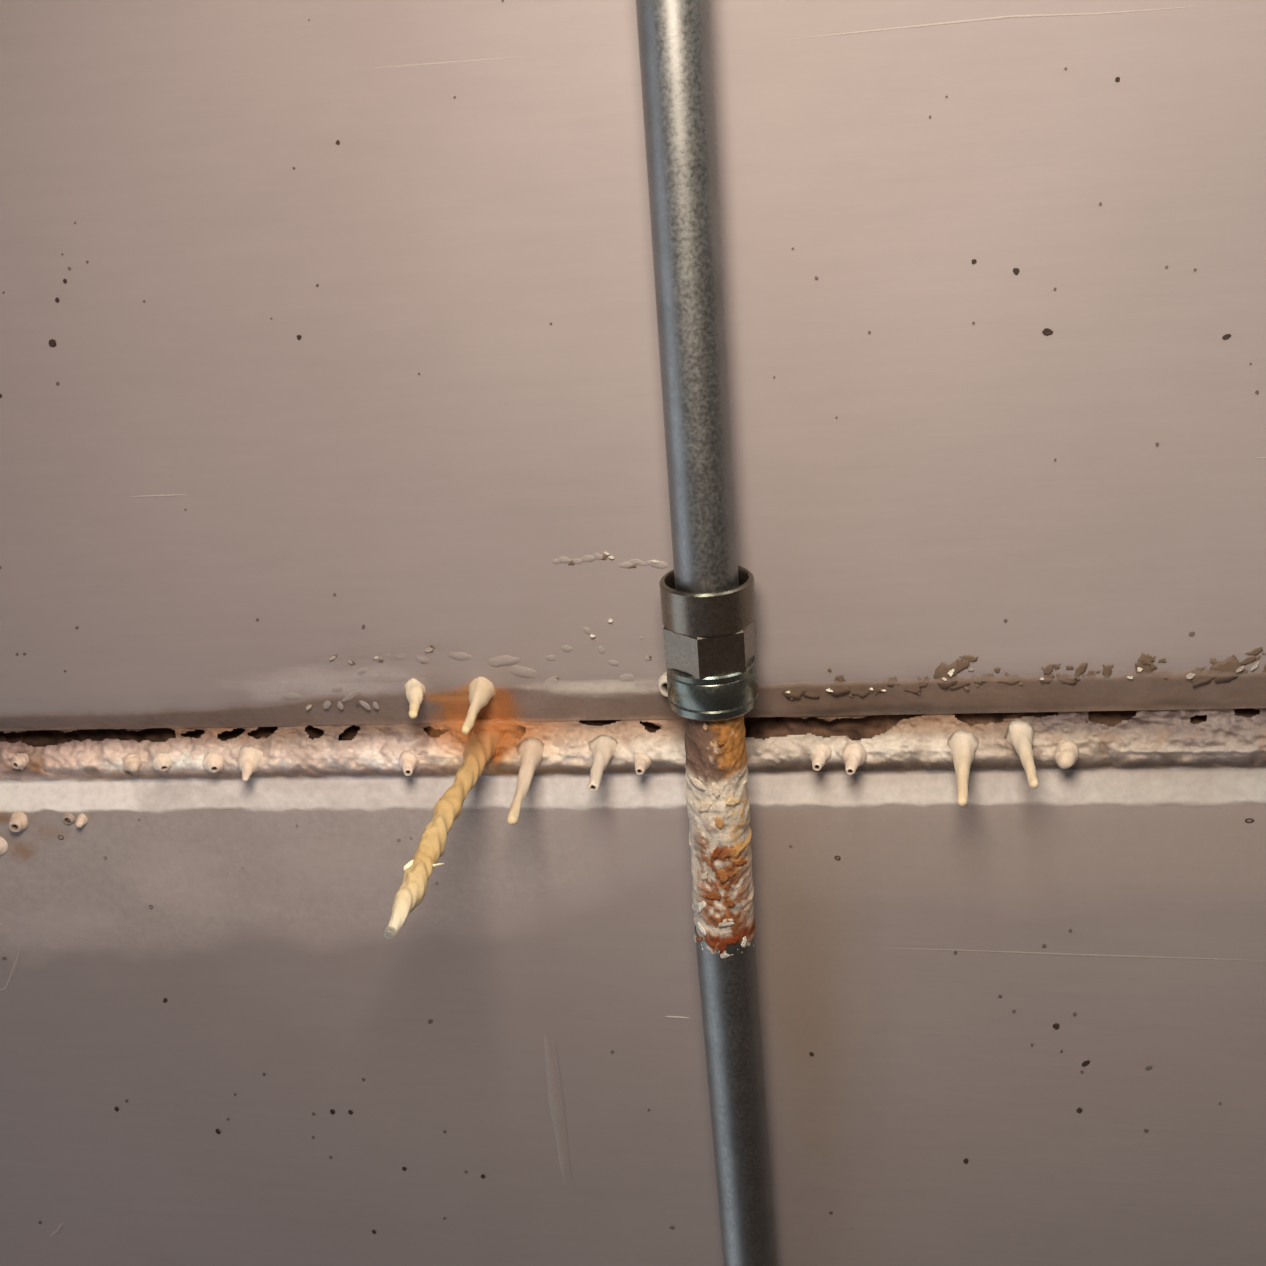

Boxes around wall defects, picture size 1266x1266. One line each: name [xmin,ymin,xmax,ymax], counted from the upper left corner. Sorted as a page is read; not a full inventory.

peeling [782,655,1023,700]
peeling [1039,663,1114,684]
peeling [1127,653,1171,680]
peeling [1186,647,1266,687]
corrosion [430,694,521,763]
damp [744,671,1266,806]
damp [0,675,469,940]
damp [410,683,687,914]
corrosion [684,715,755,958]